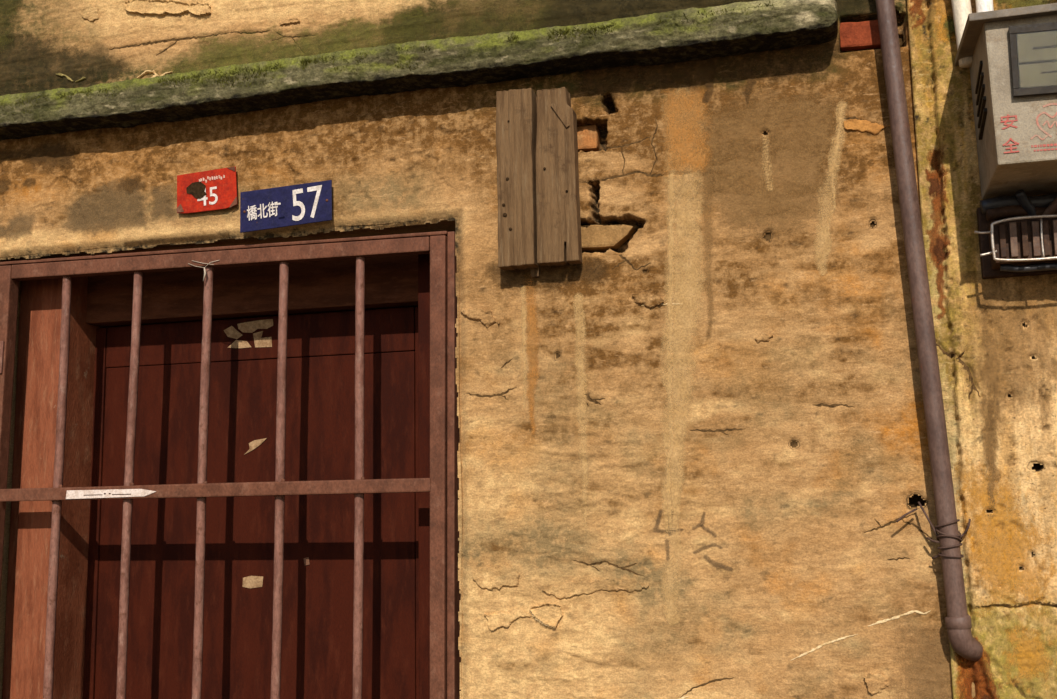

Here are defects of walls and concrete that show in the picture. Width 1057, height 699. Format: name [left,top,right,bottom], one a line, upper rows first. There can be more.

flaking render [123,0,211,17]
water stain [541,0,759,28]
water stain [835,0,878,21]
water stain [0,0,127,96]
flaking render [577,125,600,152]
flaking render [581,224,636,251]
corrosion [926,149,950,319]
peeling [529,603,563,628]
crack [976,597,1057,608]
corrosion [956,638,1000,699]